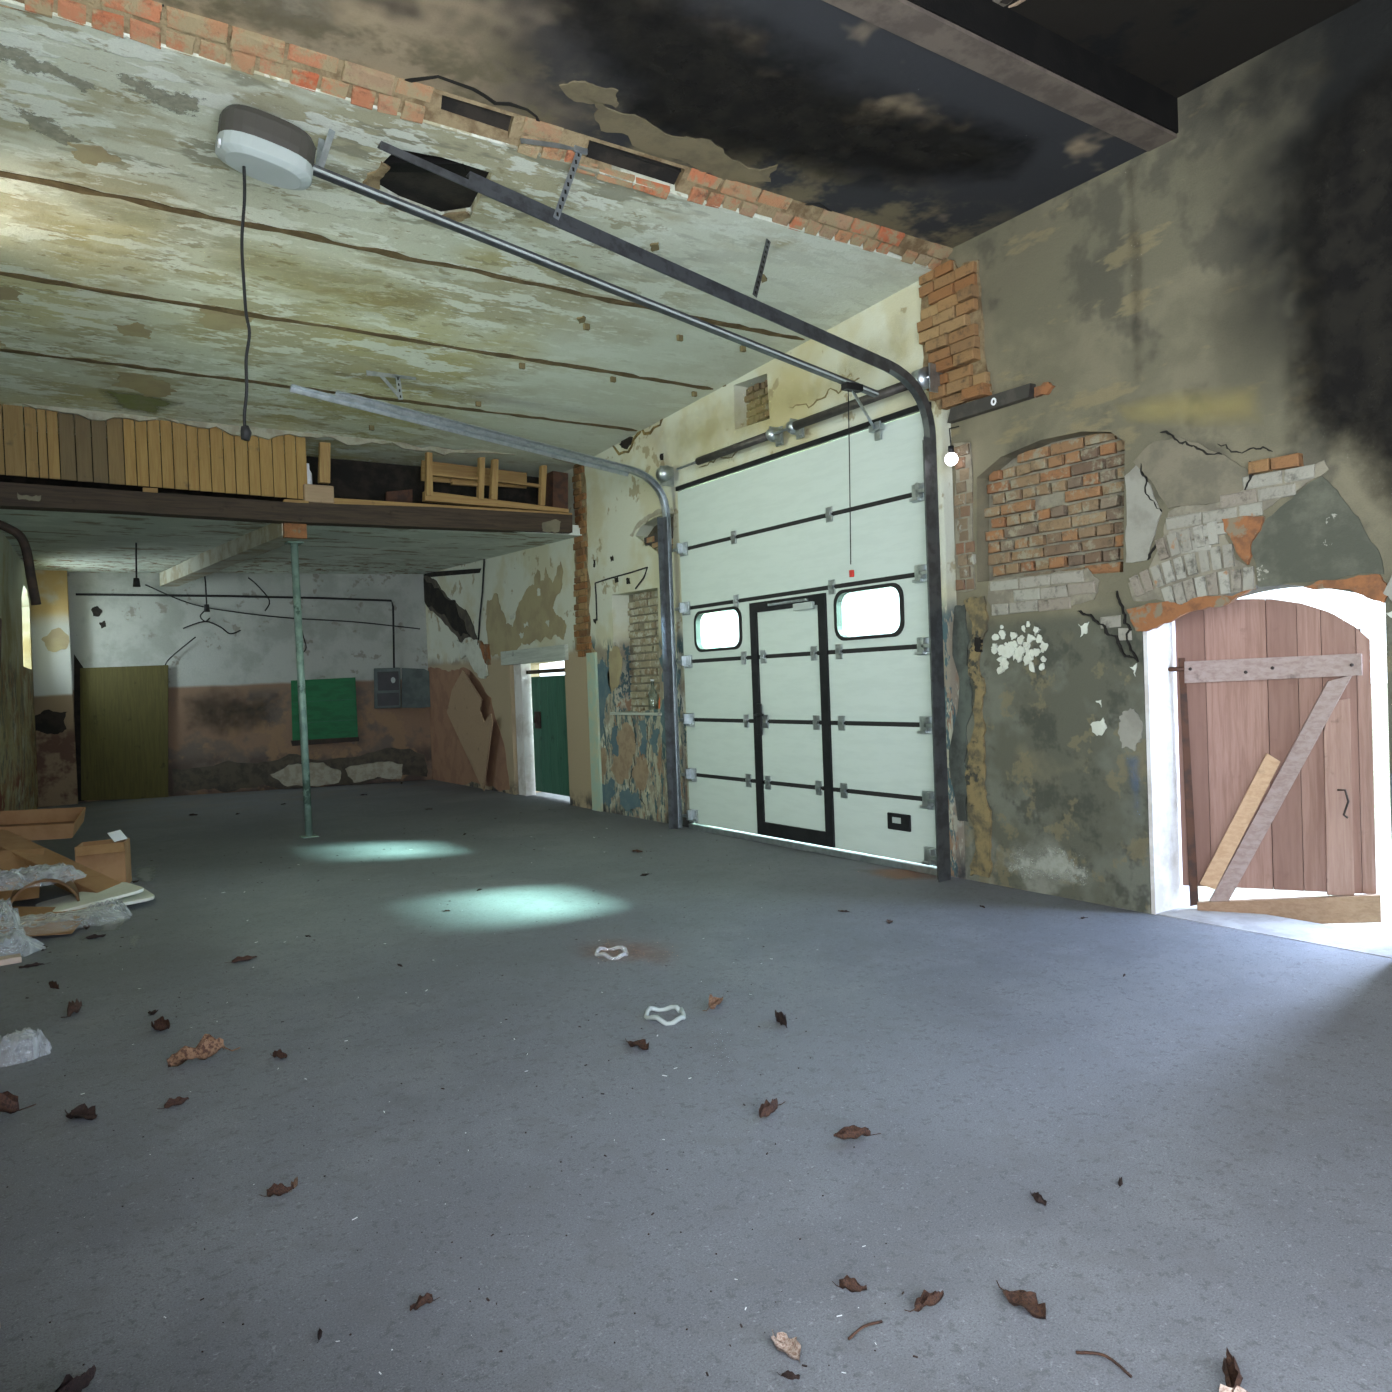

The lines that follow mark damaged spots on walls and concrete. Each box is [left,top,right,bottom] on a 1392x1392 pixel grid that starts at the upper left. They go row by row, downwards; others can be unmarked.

flaking render [0,44,96,93]
flaking render [24,0,434,124]
flaking render [16,109,121,166]
spalling [362,150,489,223]
flaking render [559,80,992,410]
crack [1140,464,1162,512]
crack [1160,431,1273,490]
flaking render [1078,453,1329,640]
flaking render [486,458,630,757]
spalling [949,443,1100,877]
crack [1078,591,1139,662]
peeling [1090,700,1143,752]